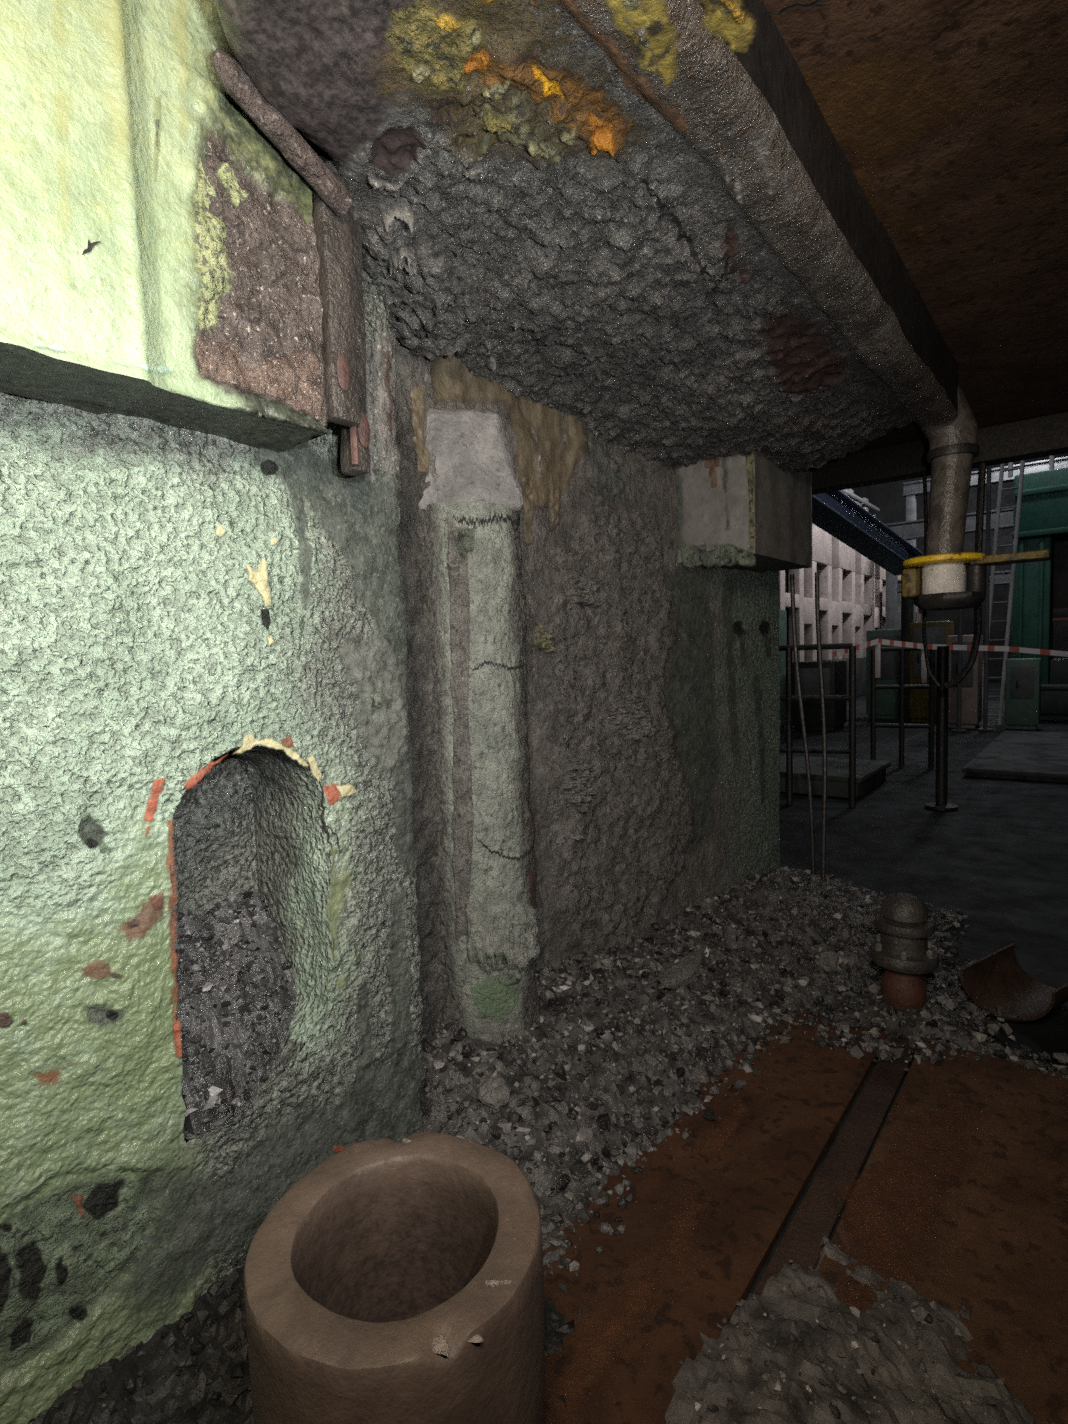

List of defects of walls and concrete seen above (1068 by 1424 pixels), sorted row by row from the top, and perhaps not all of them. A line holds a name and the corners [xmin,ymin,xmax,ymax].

peeling [607,0,677,87]
spalling [368,127,425,193]
spalling [454,129,501,180]
spalling [193,129,327,425]
peeling [246,538,278,646]
peeling [186,734,357,805]
spalling [0,1176,159,1365]